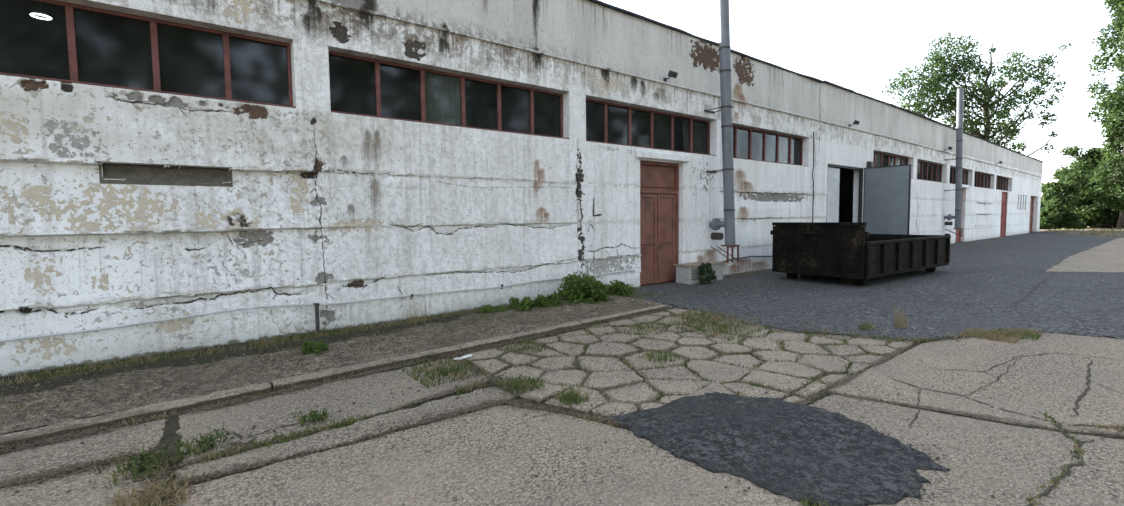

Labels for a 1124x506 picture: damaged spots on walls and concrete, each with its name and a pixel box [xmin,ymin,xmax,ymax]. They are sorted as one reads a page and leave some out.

peeling [221,0,261,27]
spalling [329,0,376,44]
spalling [689,40,755,87]
spalling [109,91,279,119]
crack [0,244,103,252]
spalling [0,111,233,232]
crack [30,131,403,318]
peeling [194,203,275,277]
peeling [290,159,327,213]
crack [393,149,635,276]
crack [888,353,1124,506]